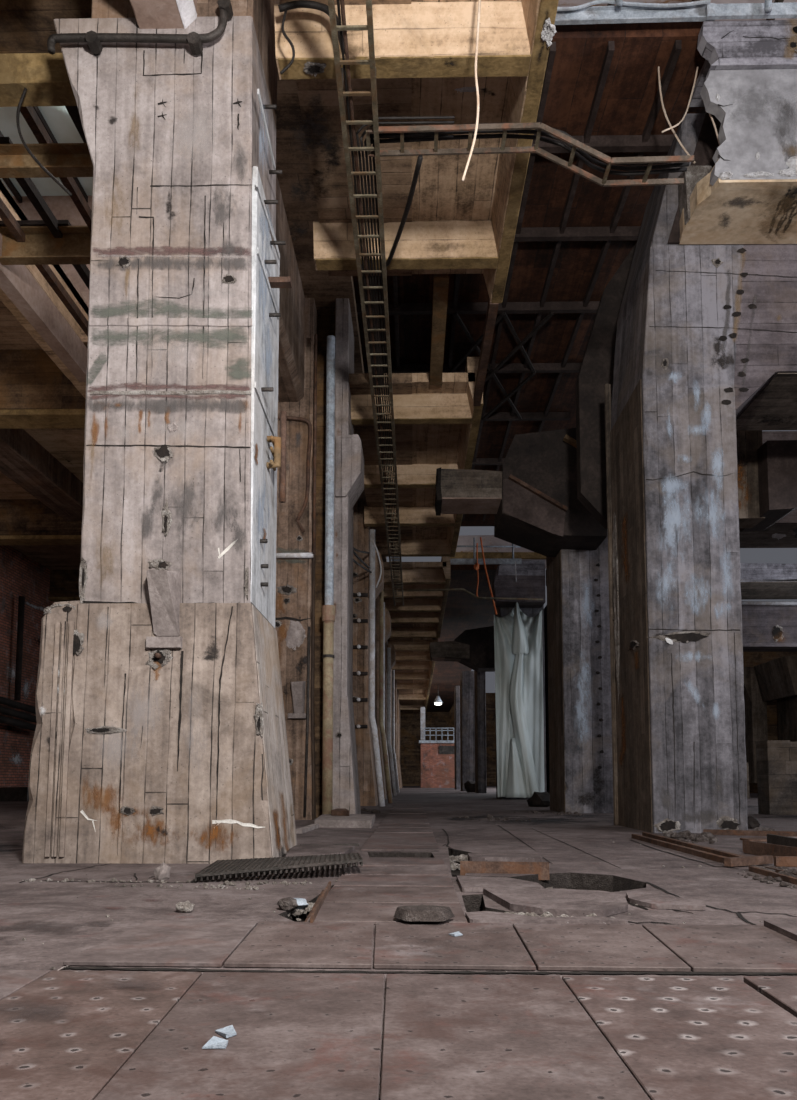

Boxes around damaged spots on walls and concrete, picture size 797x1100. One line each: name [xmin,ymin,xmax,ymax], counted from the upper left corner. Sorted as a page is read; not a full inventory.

water stain [98,243,245,270]
water stain [93,328,246,347]
rust [88,789,137,830]
rust [138,820,163,842]
rust [200,824,234,849]
crack [498,825,617,867]
crack [626,882,797,925]